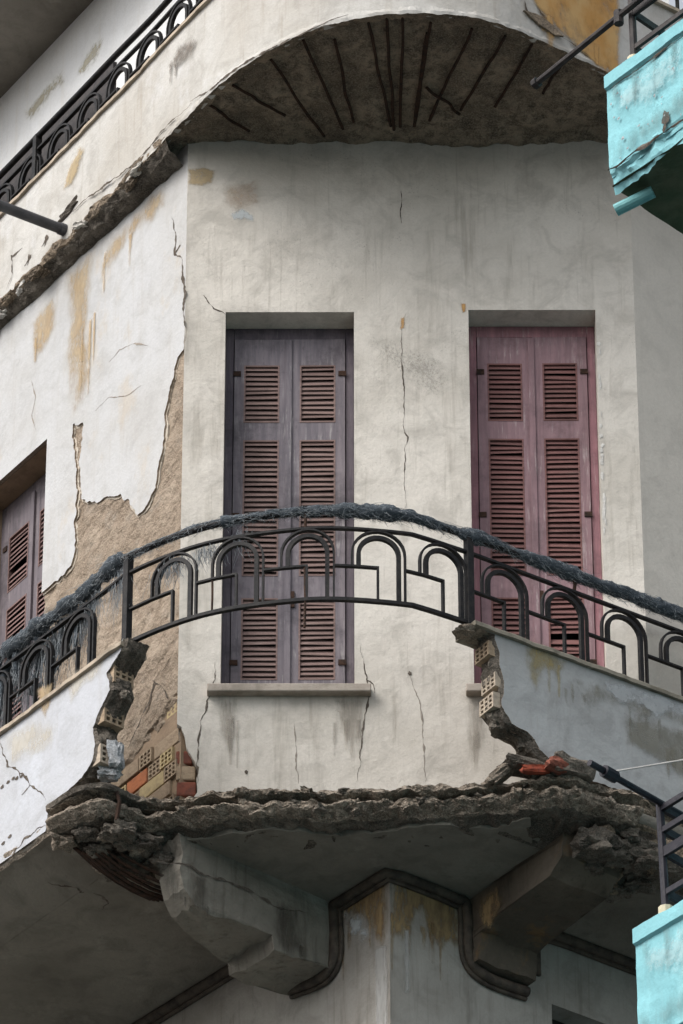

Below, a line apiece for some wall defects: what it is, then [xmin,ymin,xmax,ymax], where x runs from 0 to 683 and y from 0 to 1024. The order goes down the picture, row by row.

spalling [0,6,627,330]
damp [34,304,53,360]
damp [71,265,95,390]
damp [104,195,160,266]
crack [173,220,225,332]
crack [401,317,409,499]
spalling [0,354,683,903]
crack [1,746,46,800]
crack [196,665,216,783]
crack [357,647,375,779]
crack [411,679,426,777]
crack [4,826,43,869]